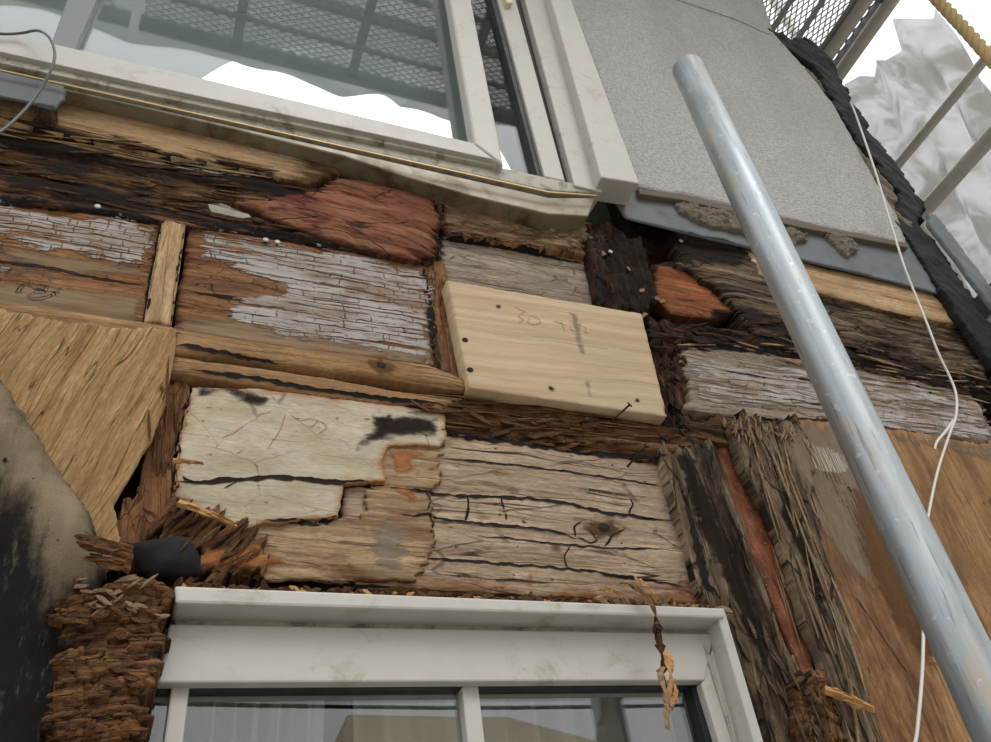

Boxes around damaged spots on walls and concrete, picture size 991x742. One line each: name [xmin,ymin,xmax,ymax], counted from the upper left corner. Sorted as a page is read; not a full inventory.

damp [0,104,306,197]
damp [3,172,153,211]
peeling [0,200,158,279]
peeling [208,203,251,218]
peeling [0,284,140,322]
peeling [181,229,436,365]
peeling [858,373,991,439]
peeling [201,545,279,568]
crack [178,458,682,587]
damp [677,453,768,664]